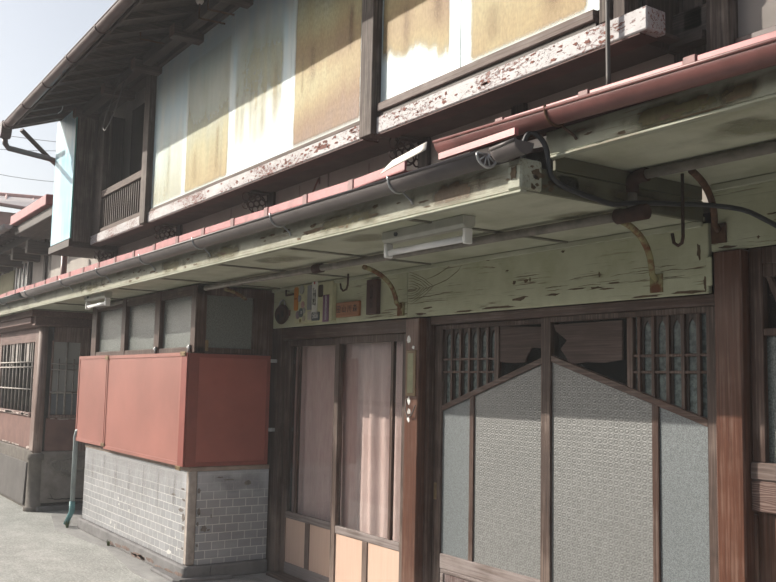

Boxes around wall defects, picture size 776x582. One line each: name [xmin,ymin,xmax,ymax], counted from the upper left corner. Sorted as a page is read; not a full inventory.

leakage [635,80,757,128]
leakage [723,119,776,135]
peeling [548,272,620,296]